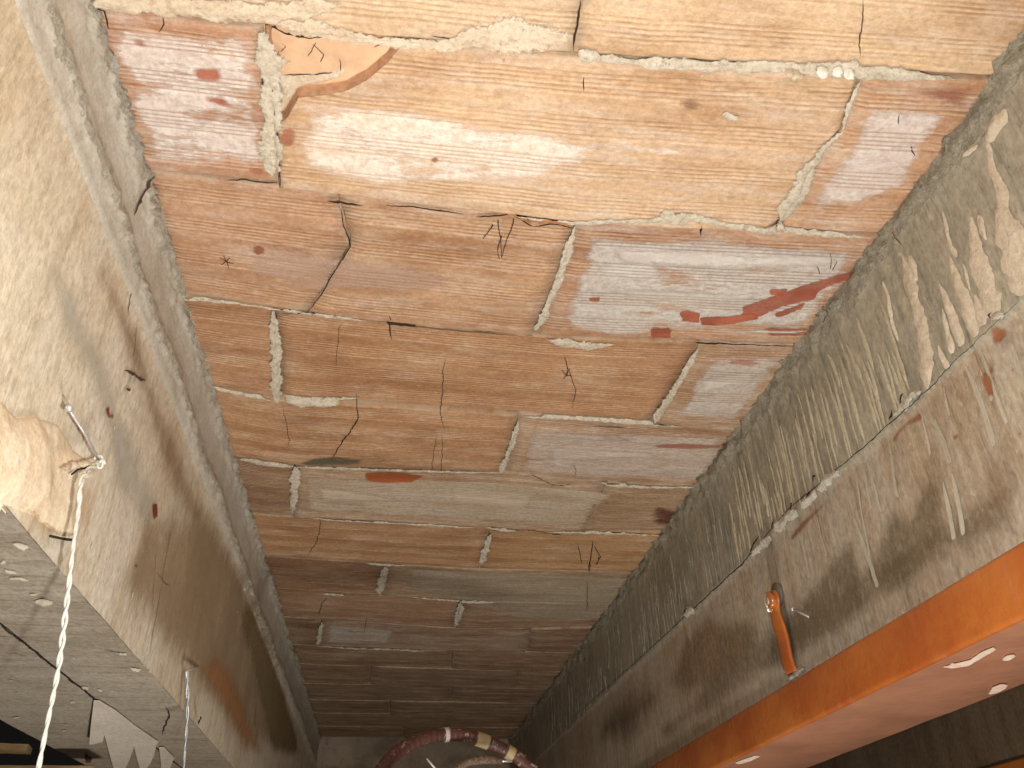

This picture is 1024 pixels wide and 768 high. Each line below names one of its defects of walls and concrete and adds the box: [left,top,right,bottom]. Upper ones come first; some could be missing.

crack [573,0,581,47]
spalling [264,24,401,146]
crack [134,176,155,216]
efflorescence [302,105,594,184]
efflorescence [817,110,944,209]
crack [281,201,570,362]
efflorescence [568,239,848,334]
water stain [964,351,1008,447]
water stain [409,281,965,744]
crack [564,303,1017,725]
crack [491,530,638,612]